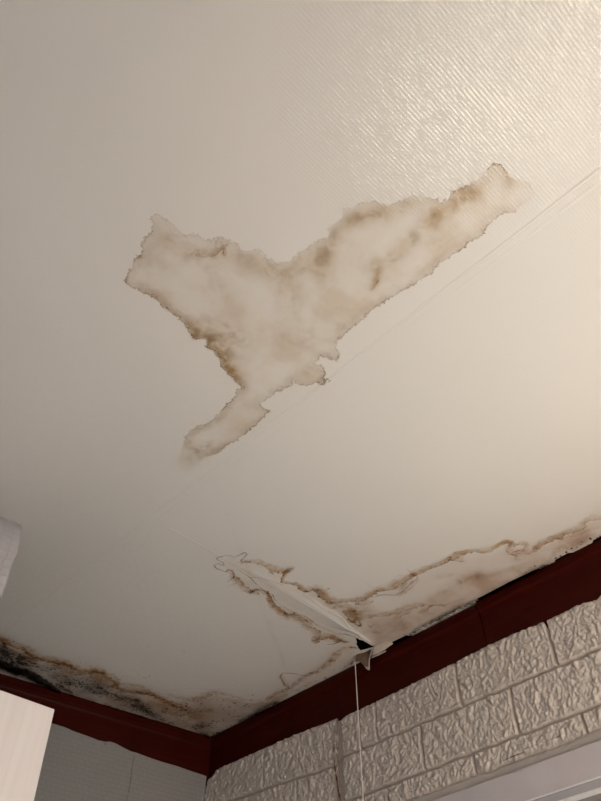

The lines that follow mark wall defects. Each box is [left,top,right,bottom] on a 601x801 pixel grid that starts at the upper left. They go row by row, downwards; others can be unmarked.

water stain [397,536,600,642]
water stain [0,640,286,738]